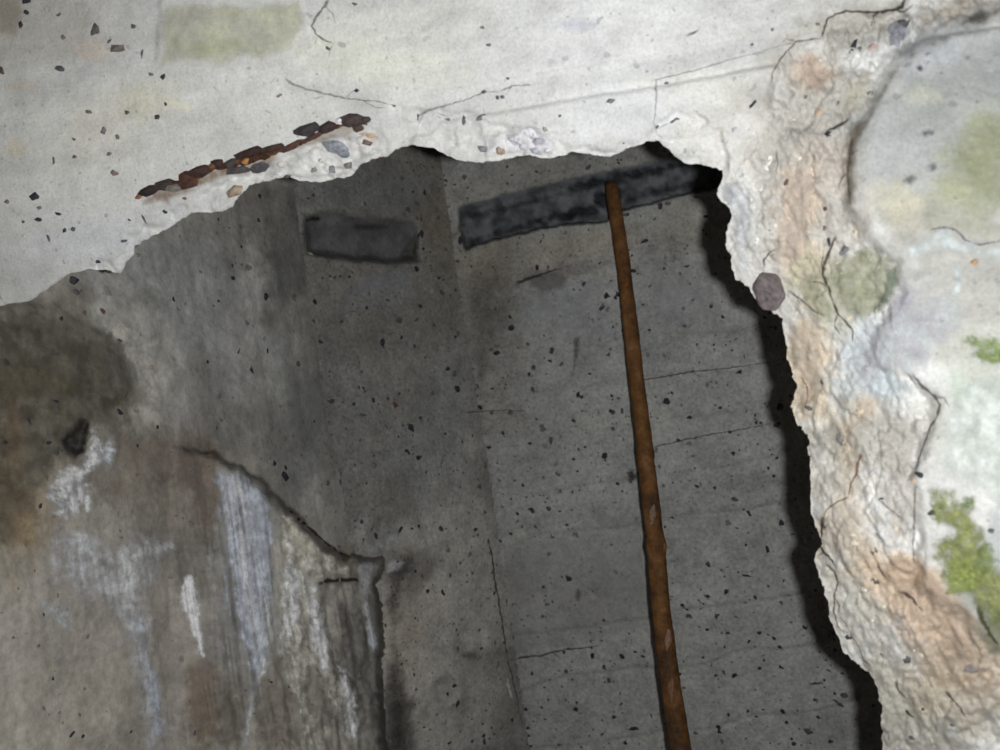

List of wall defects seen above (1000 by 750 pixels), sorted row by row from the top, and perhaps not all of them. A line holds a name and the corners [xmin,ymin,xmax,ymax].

crack [772,0,910,78]
corrosion [135,113,371,200]
spalling [265,133,383,179]
spalling [22,192,42,223]
crack [792,240,853,339]
spalling [102,311,162,410]
crack [909,375,947,467]
leakage [47,438,116,519]
crack [820,455,867,663]
leakage [49,533,172,747]
leakage [181,575,205,657]
leakage [213,473,408,750]